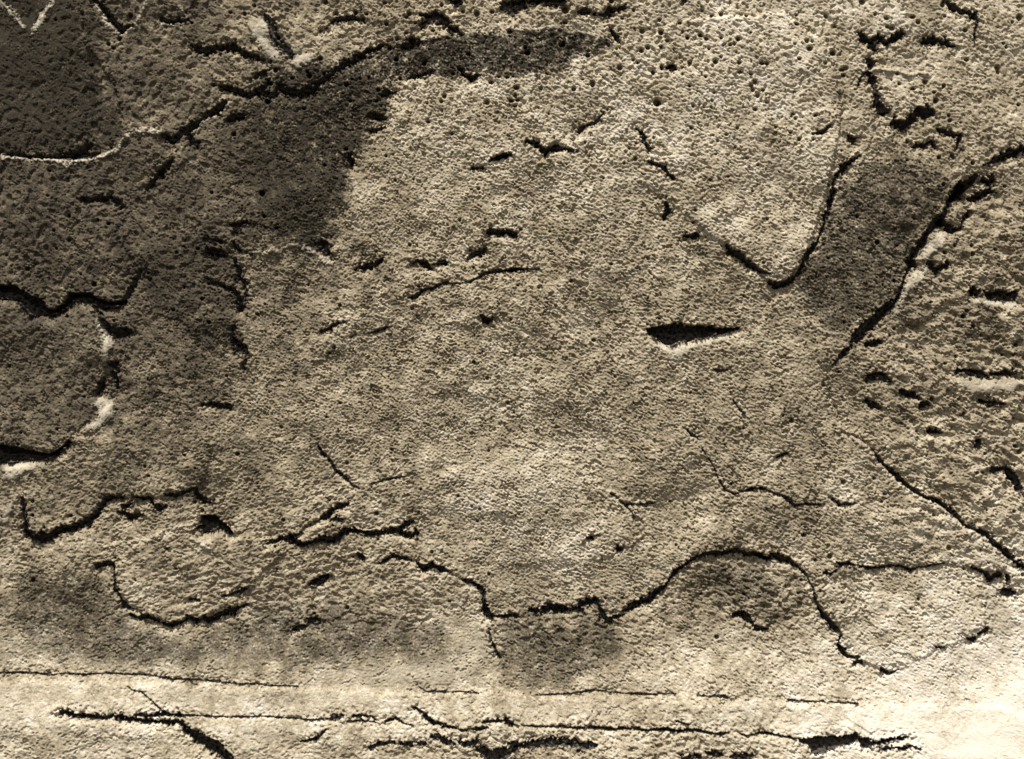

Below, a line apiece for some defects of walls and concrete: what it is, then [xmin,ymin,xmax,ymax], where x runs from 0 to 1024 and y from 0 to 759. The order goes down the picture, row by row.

damp [0,0,122,172]
crack [145,13,433,191]
crack [726,154,861,289]
damp [802,154,945,329]
crack [831,145,1024,367]
damp [130,376,164,408]
spalling [647,322,739,360]
crack [20,487,211,543]
crack [94,561,248,627]
crack [262,445,945,659]
crack [873,450,1024,585]
crack [0,670,796,759]